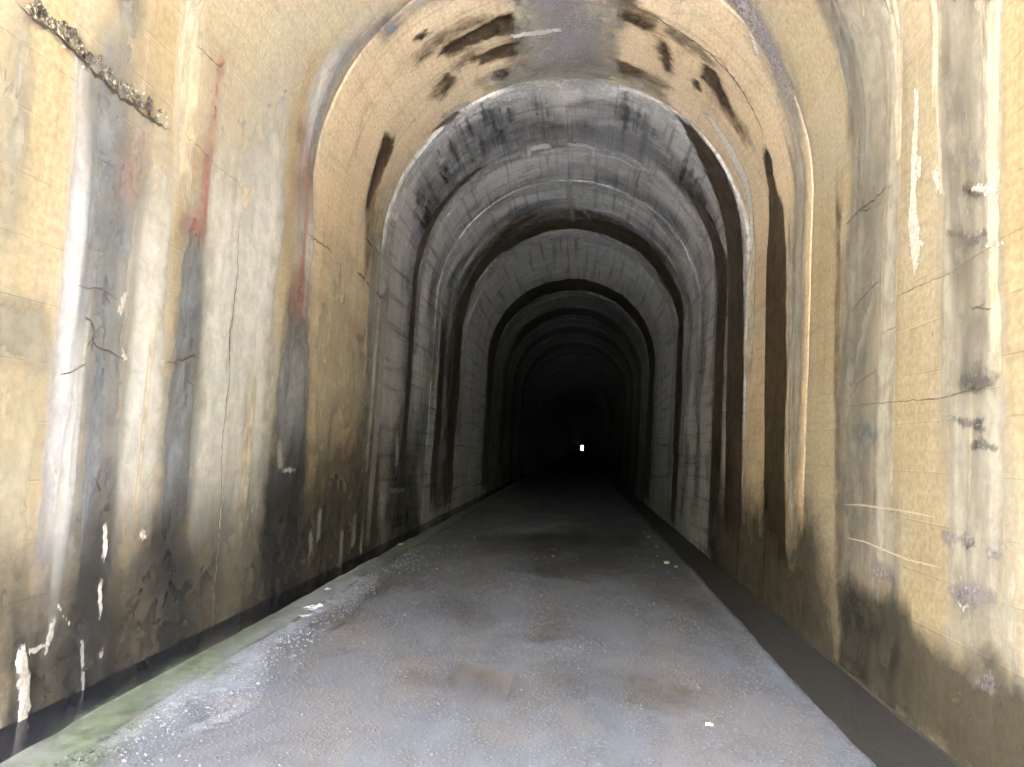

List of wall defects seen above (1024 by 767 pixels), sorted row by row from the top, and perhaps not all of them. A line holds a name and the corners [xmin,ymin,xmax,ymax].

spalling [18,0,172,131]
rust [190,149,212,238]
crack [846,184,892,224]
crack [60,285,124,385]
crack [182,130,246,627]
leakage [0,0,505,726]
leakage [428,0,1024,767]
crack [846,370,1006,407]